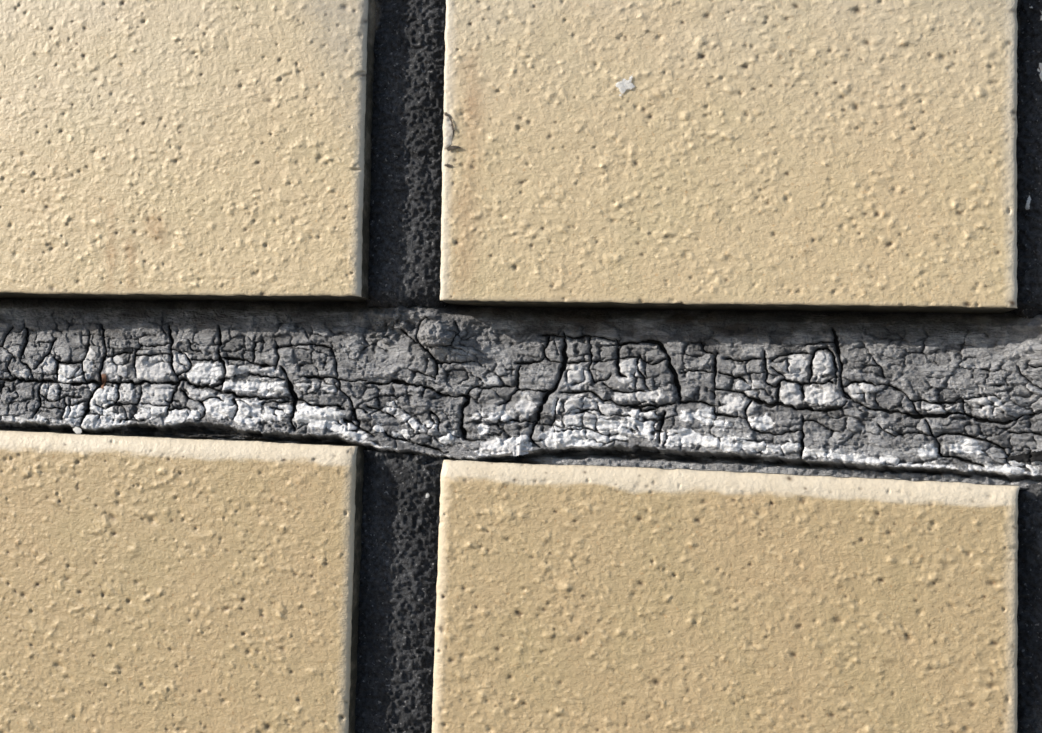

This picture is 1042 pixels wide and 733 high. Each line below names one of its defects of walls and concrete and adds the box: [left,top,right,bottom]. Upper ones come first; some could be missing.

spalling [369,312,412,345]
crack [0,298,1042,490]
peeling [480,437,532,456]
spalling [999,451,1042,463]